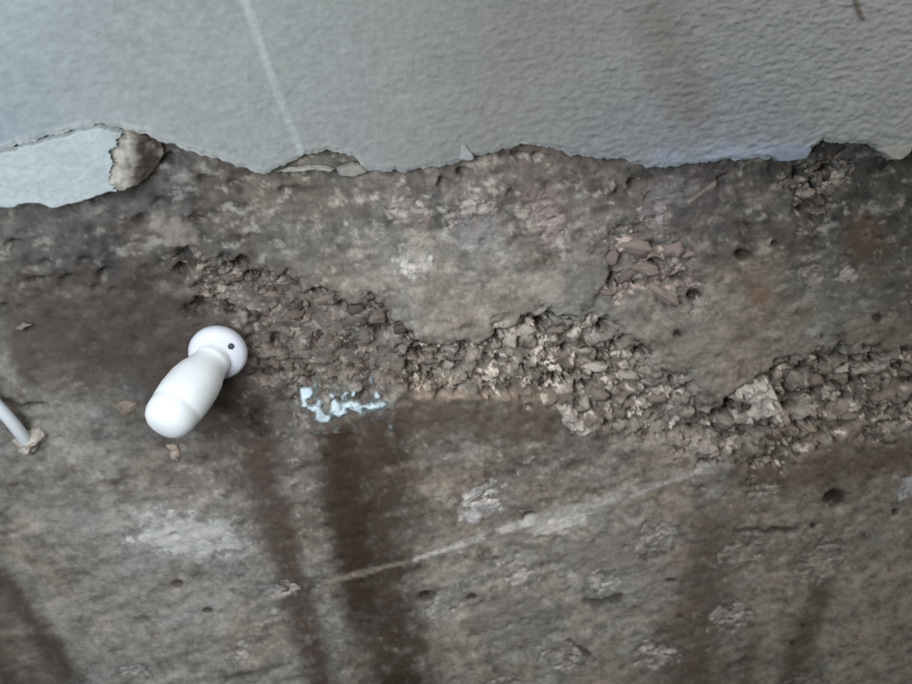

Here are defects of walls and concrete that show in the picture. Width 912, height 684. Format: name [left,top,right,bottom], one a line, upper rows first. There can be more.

flaking render [275,161,368,178]
flaking render [765,146,812,162]
flaking render [874,144,912,160]
spalling [387,188,433,225]
spalling [448,197,508,230]
spalling [390,242,433,283]
spalling [798,263,858,287]
leakage [124,509,251,561]
leakage [245,406,330,684]
leakage [300,387,430,684]
leakage [673,524,721,684]
leakage [0,574,71,681]